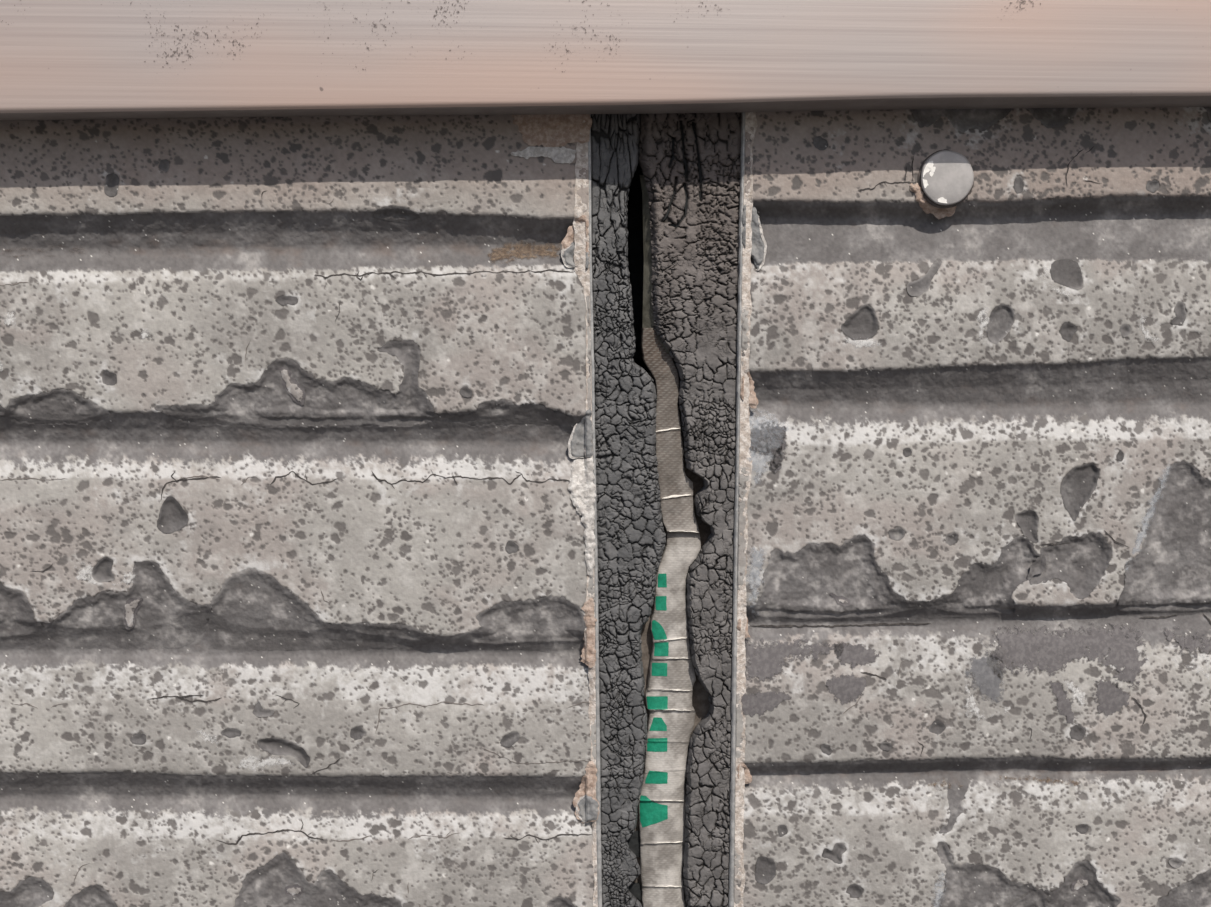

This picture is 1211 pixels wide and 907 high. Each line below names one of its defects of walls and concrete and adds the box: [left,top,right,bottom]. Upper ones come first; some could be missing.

crack [662,123,703,227]
spalling [0,389,110,424]
spalling [102,370,117,385]
spalling [1060,463,1099,521]
spalling [1116,460,1211,617]
spalling [737,510,1112,638]
spalling [0,557,597,668]
spalling [937,776,1121,907]
spalling [0,877,118,907]
spalling [234,852,402,907]
spalling [547,897,575,907]
spalling [1157,869,1211,907]